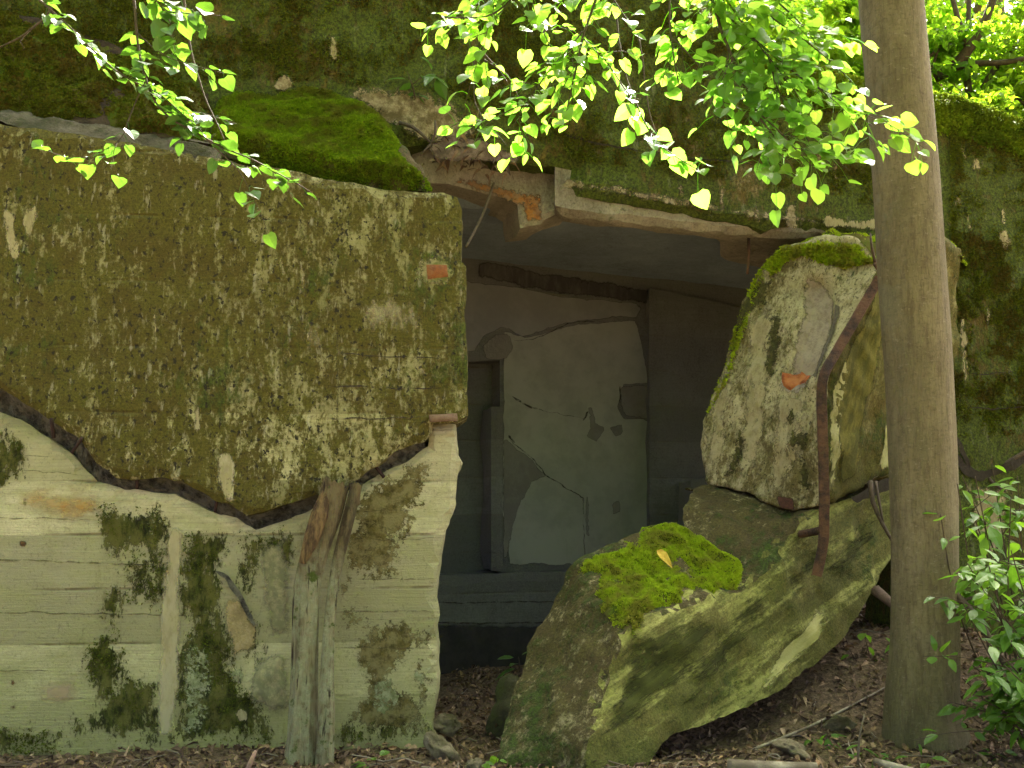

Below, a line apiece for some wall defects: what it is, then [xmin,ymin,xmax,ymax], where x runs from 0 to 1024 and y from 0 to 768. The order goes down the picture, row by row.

rust [457,177,542,221]
crack [307,321,439,420]
peeling [464,262,648,565]
crack [0,389,319,530]
crack [345,442,426,512]
crack [0,558,152,566]
crack [0,609,210,617]